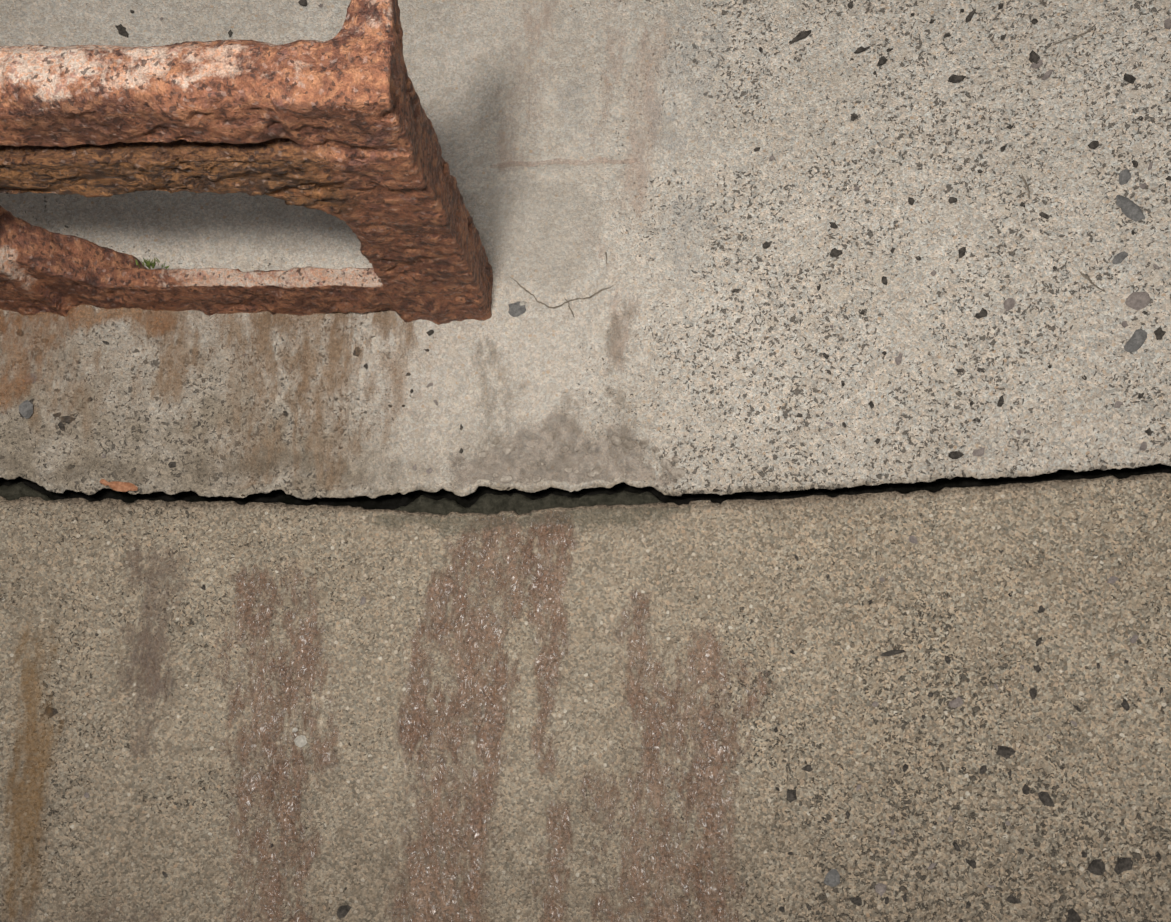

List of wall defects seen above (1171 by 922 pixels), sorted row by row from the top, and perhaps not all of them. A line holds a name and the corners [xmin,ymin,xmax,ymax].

corrosion [69,305,181,393]
crack [0,464,1171,515]